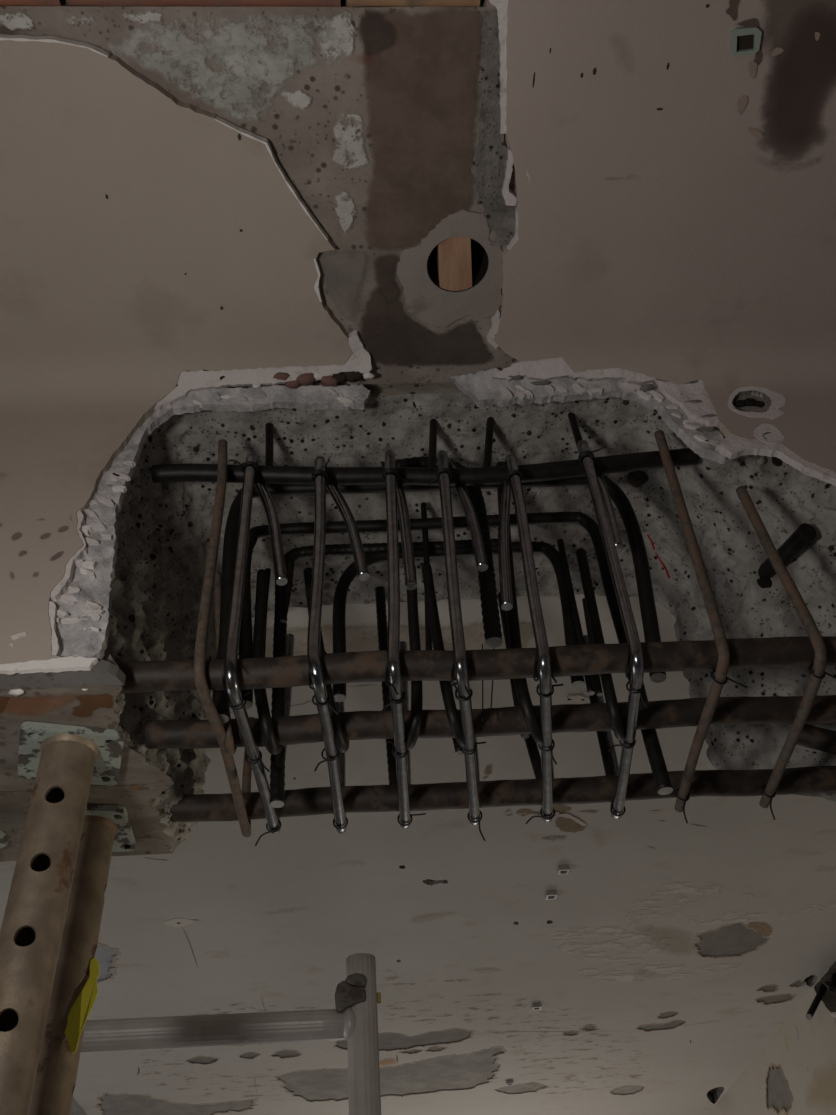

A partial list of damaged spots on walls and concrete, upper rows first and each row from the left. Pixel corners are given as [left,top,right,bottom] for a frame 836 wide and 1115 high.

water stain [726,0,836,155]
spalling [0,0,836,675]
spalling [269,745,285,808]
spalling [385,739,397,785]
spalling [521,734,542,779]
spalling [596,731,614,775]
spalling [641,729,673,795]
spalling [691,922,772,959]
spalling [635,1011,687,1032]
spalling [239,1049,349,1103]
spalling [378,1028,549,1097]
spalling [765,1063,793,1115]